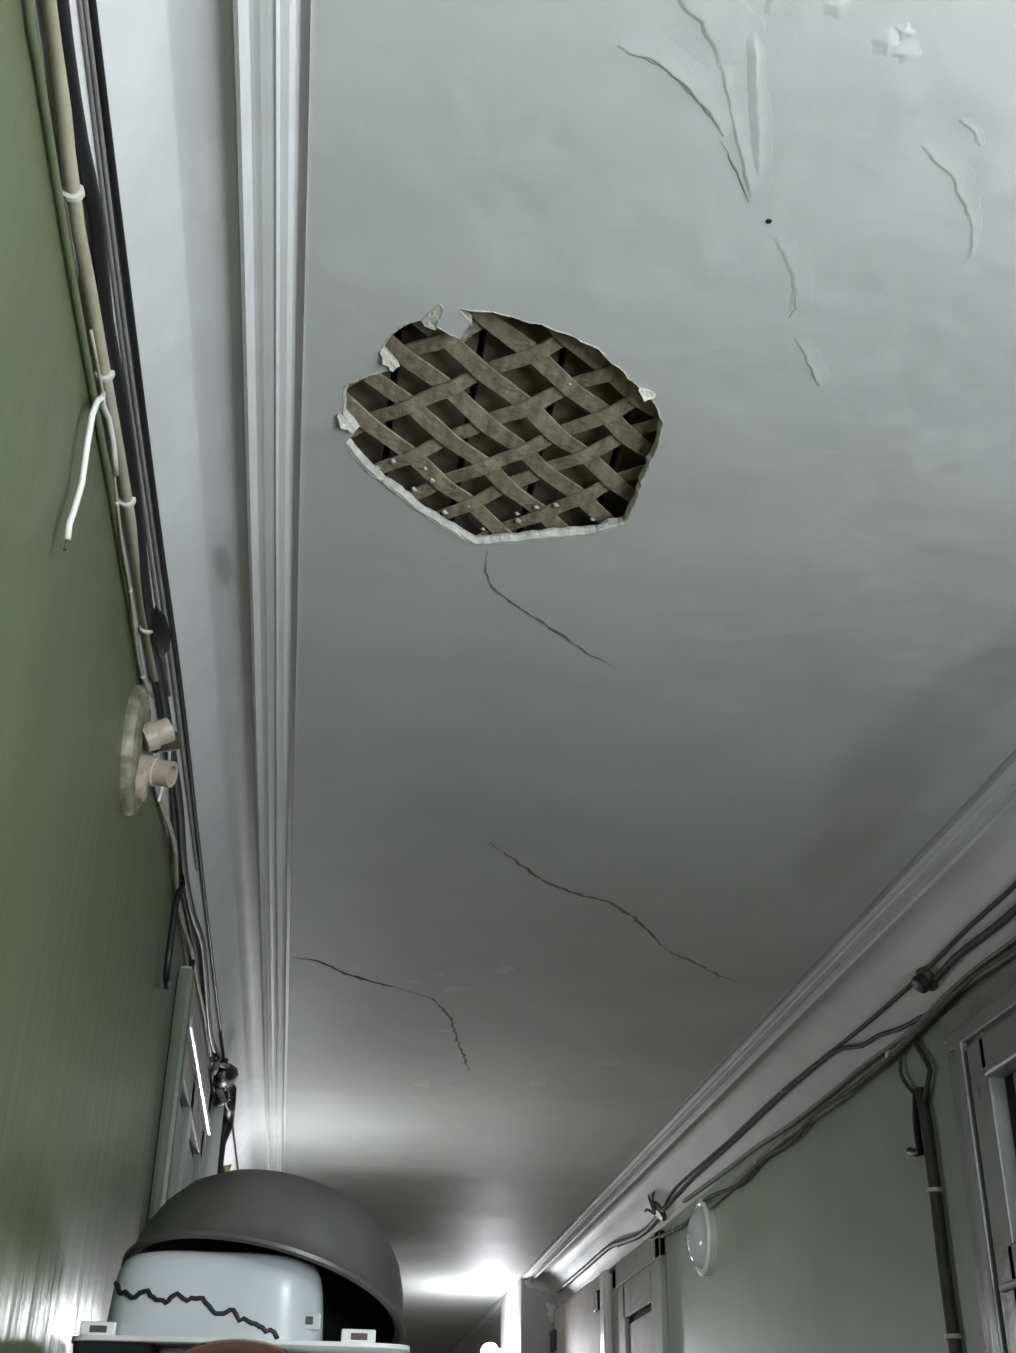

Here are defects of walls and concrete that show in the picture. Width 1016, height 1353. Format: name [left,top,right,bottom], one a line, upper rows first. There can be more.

flaking render [337,303,664,546]
crack [484,552,611,665]
crack [490,842,737,983]
crack [292,957,470,1071]